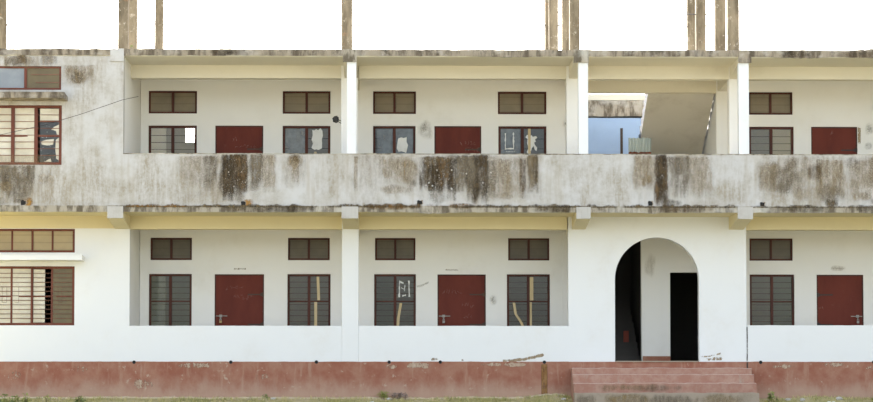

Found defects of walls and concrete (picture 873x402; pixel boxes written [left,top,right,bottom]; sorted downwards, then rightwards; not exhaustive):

leakage [0,166,35,200]
leakage [205,154,272,198]
leakage [389,154,495,202]
leakage [520,155,538,192]
leakage [635,155,689,205]
leakage [809,161,842,206]